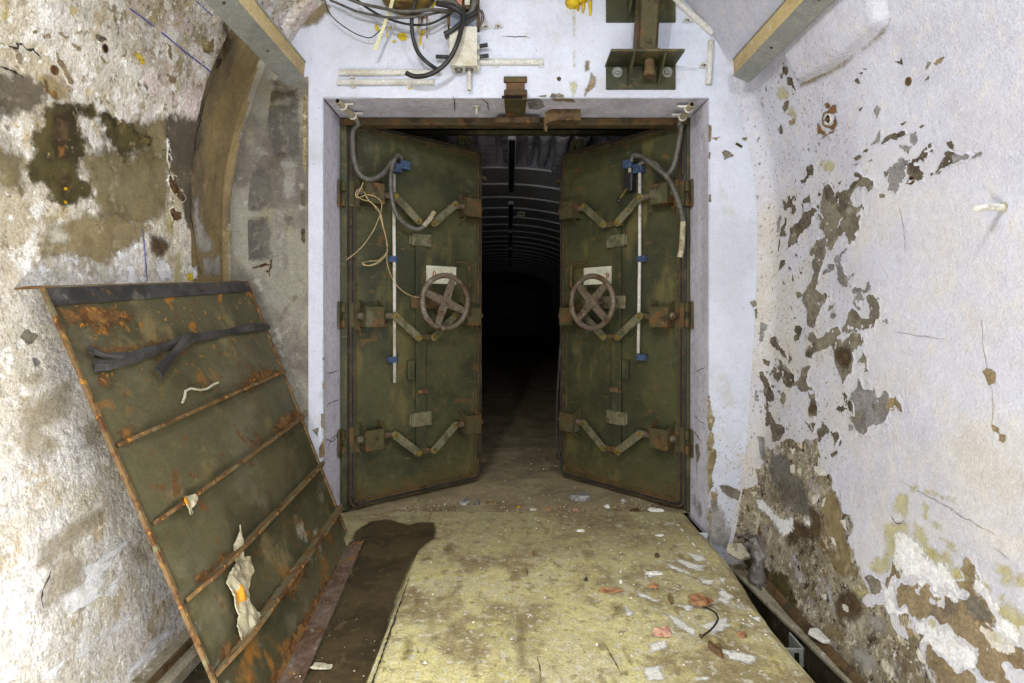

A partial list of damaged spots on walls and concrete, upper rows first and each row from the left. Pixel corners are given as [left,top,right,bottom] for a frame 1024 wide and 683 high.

water stain [0,73,231,283]
spalling [166,138,187,222]
spalling [695,105,1024,683]
water stain [304,520,435,683]